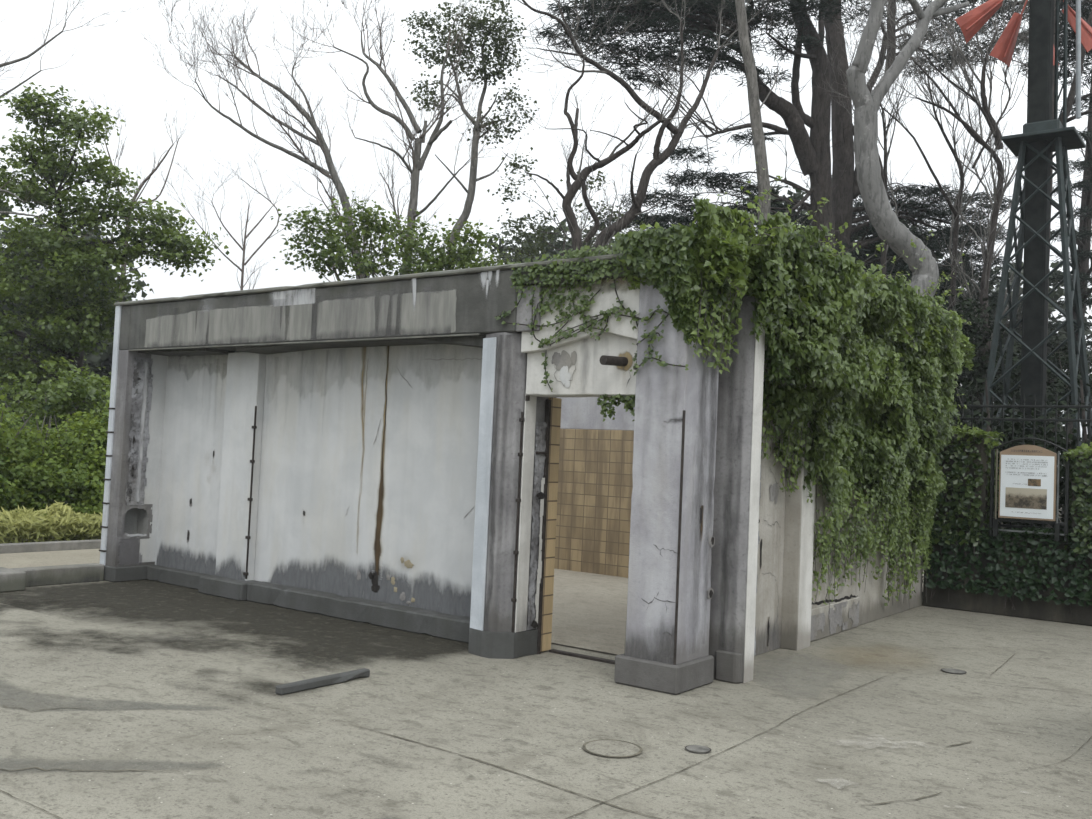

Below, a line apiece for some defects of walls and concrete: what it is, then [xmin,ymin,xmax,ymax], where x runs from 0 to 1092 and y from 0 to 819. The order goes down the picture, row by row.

water stain [156,546,245,580]
water stain [0,578,469,667]
peeling [118,289,457,566]
water stain [270,560,471,617]
rust [357,346,389,592]
water stain [492,335,502,485]
spalling [527,421,547,630]
crack [810,594,859,641]